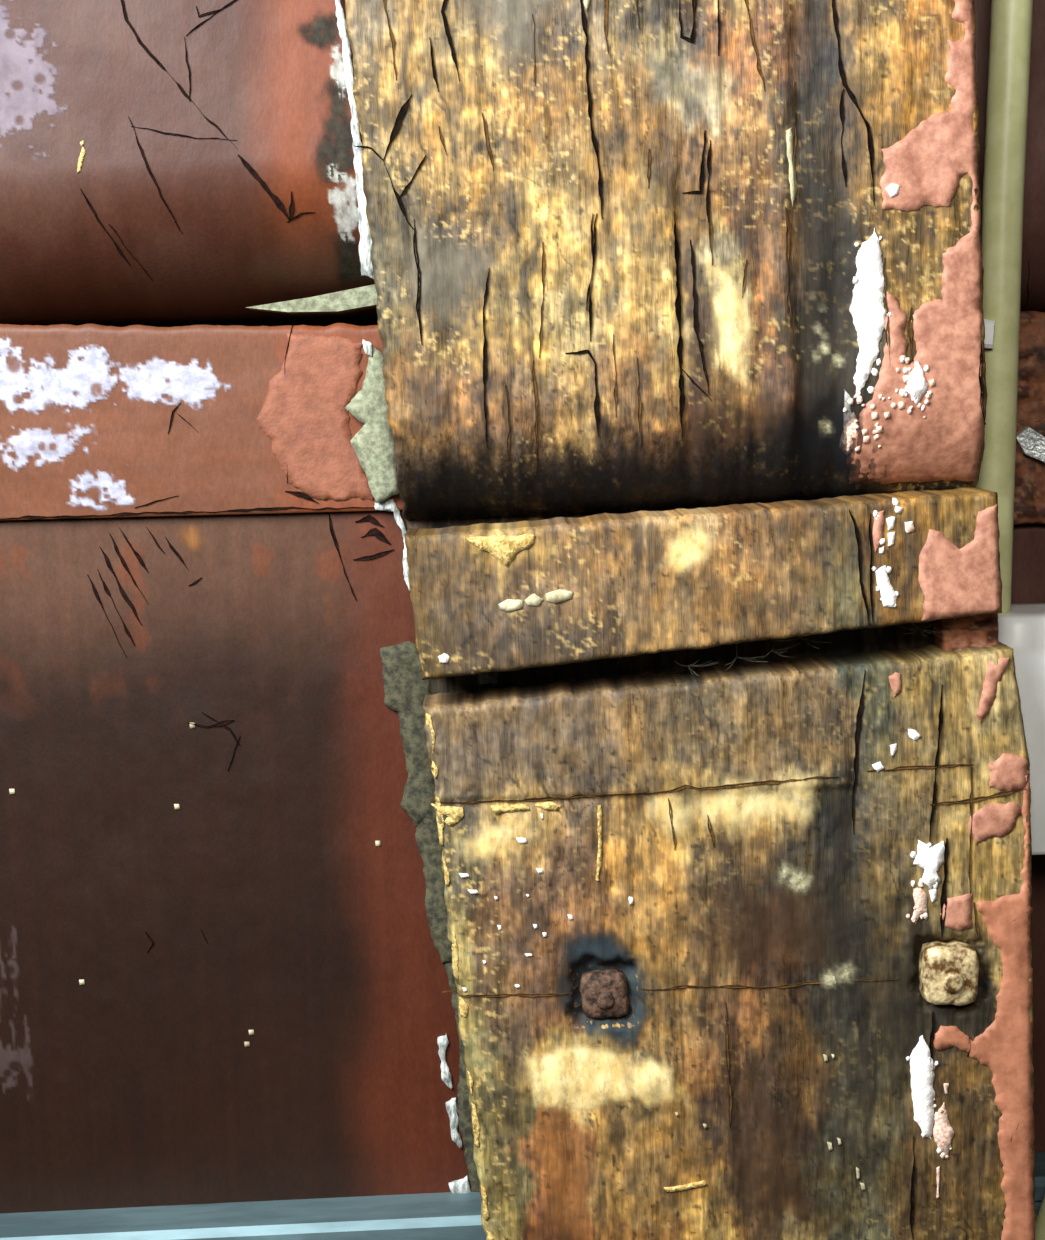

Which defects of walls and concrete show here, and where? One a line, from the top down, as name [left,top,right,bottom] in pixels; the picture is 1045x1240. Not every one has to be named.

peeling [0,426,89,468]
peeling [71,472,133,509]
peeling [0,338,230,413]
crack [6,466,394,658]
crack [120,0,315,233]
crack [354,0,459,345]
crack [482,0,641,472]
crack [674,130,713,429]
crack [832,0,874,204]
peeling [845,0,985,484]
peeling [872,504,1001,621]
peeling [912,753,1036,1240]